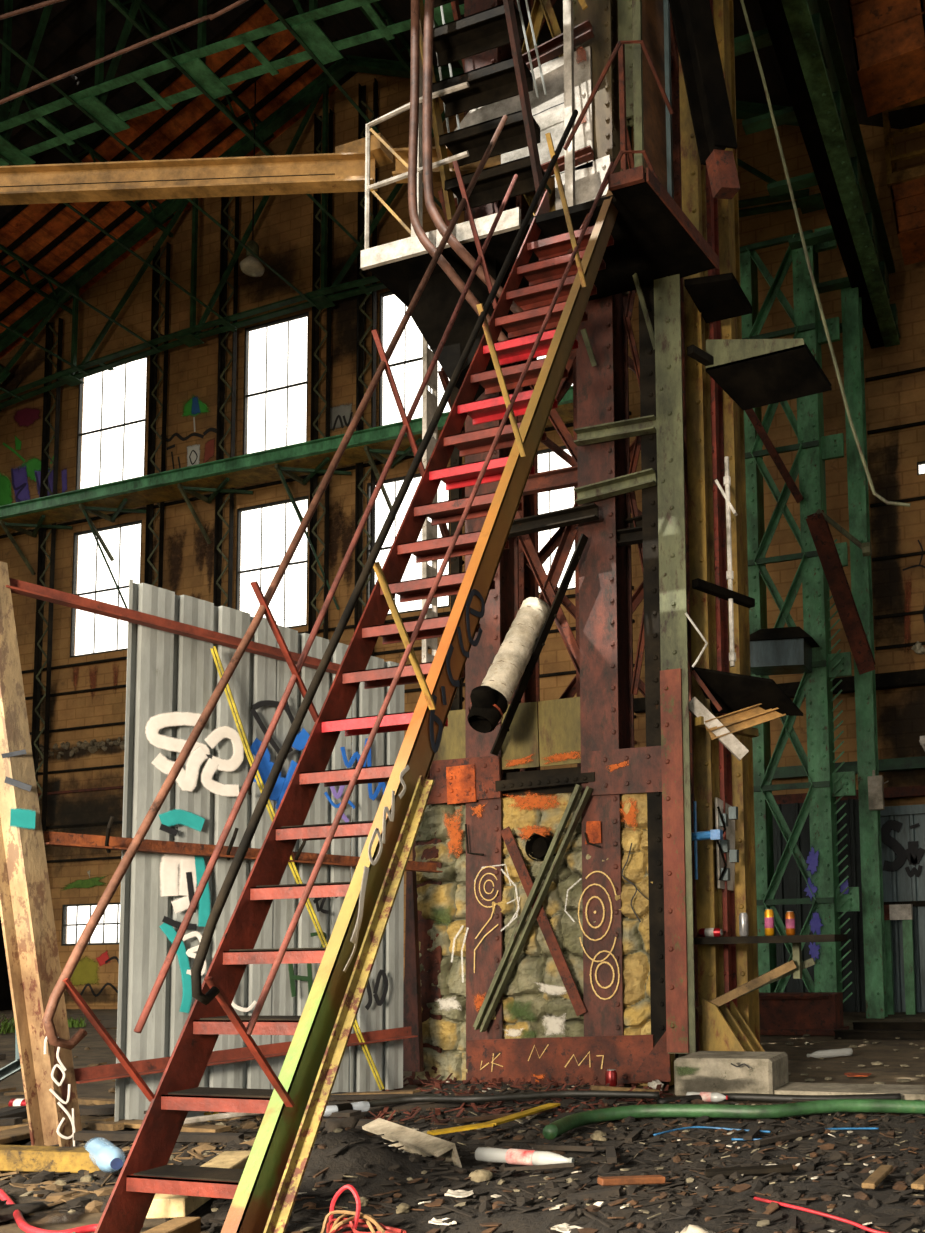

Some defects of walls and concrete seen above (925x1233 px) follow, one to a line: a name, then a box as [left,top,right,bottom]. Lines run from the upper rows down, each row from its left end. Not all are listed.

water stain [867,439,911,643]
corrosion [506,751,581,766]
corrosion [507,793,561,810]
corrosion [619,800,638,830]
corrosion [444,804,485,858]
corrosion [517,825,551,840]
corrosion [474,992,486,1011]